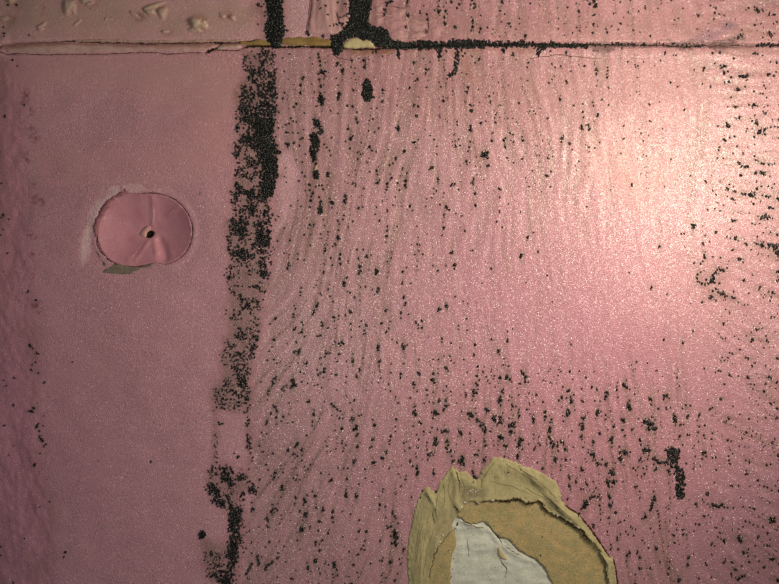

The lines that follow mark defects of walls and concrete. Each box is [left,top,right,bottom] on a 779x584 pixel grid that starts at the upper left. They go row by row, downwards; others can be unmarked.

crack [0,37,425,61]
crack [479,43,759,60]
damp [745,6,779,64]
peeling [96,251,153,274]
damp [390,51,779,584]
damp [290,389,407,584]
peeling [406,457,619,584]